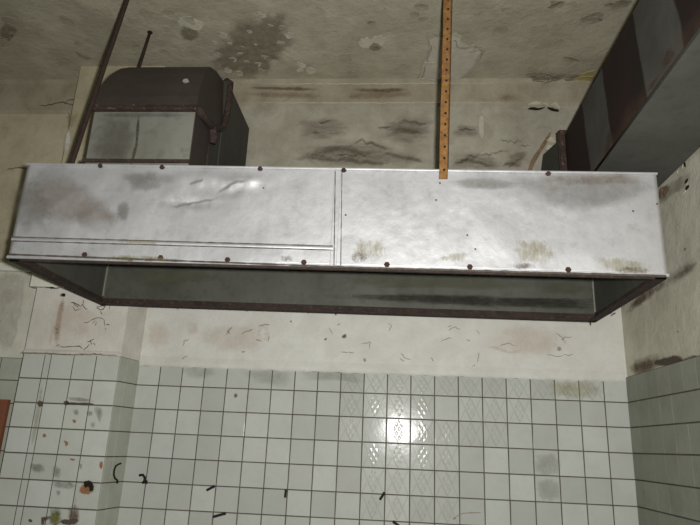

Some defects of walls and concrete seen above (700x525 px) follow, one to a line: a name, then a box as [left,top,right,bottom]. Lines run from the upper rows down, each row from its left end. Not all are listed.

peeling [178,16,204,40]
crack [25,301,110,356]
water stain [634,356,696,372]